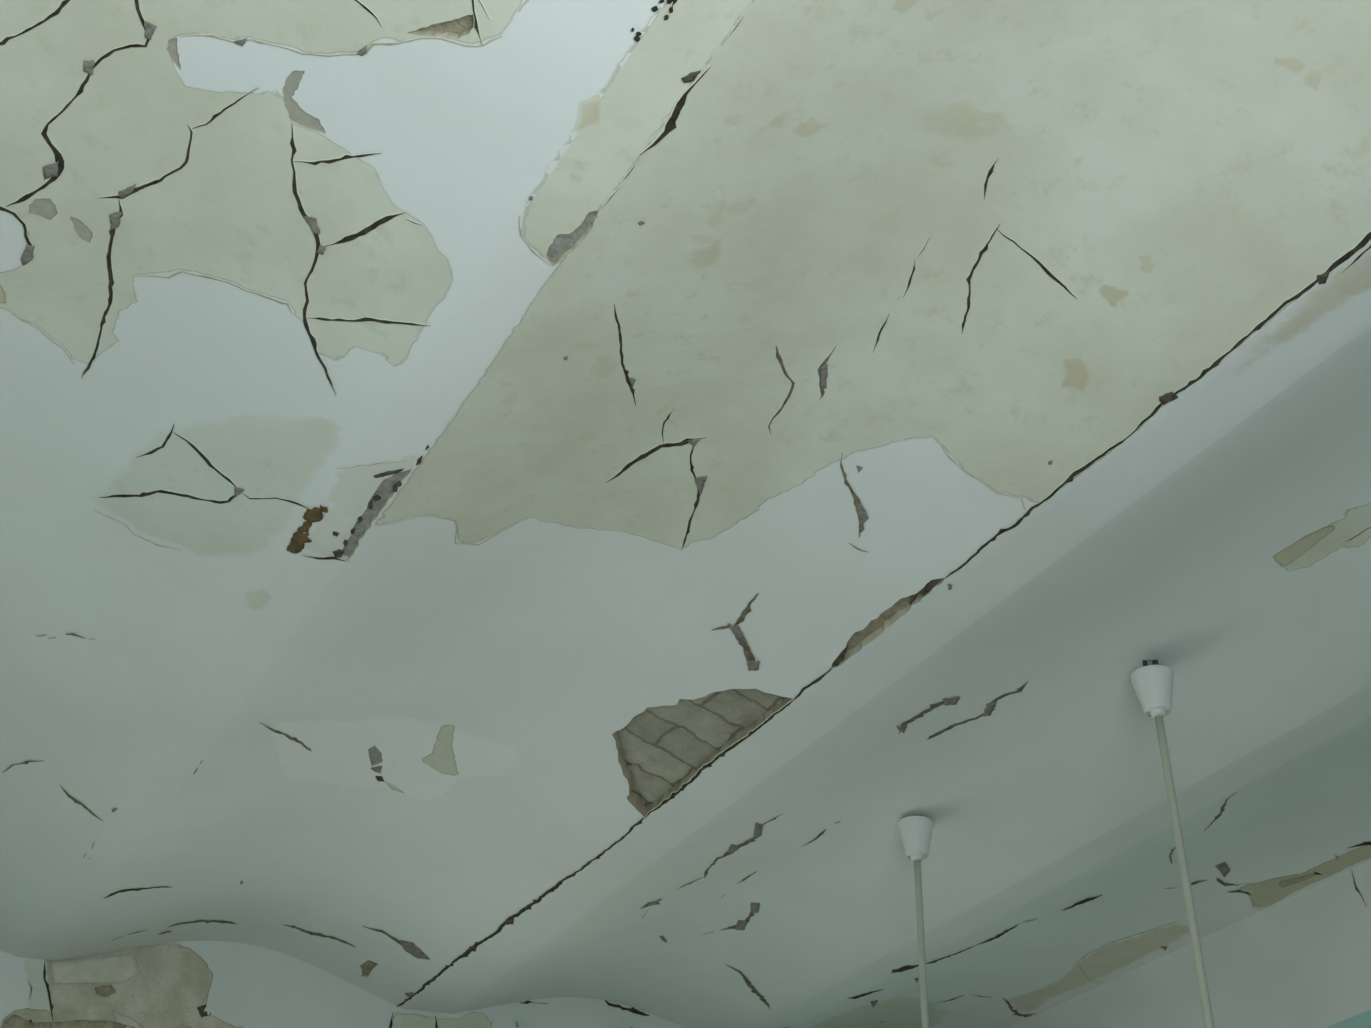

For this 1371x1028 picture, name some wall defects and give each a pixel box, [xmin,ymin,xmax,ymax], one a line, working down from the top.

peeling [0,0,529,367]
crack [601,65,711,209]
peeling [87,0,1371,571]
crack [961,158,1078,334]
crack [605,304,707,551]
crack [945,230,1371,578]
rust [287,505,328,554]
crack [711,593,760,671]
spalling [612,689,793,817]
crack [284,668,832,1028]
peeling [1237,845,1371,910]
spalling [1,943,244,1028]